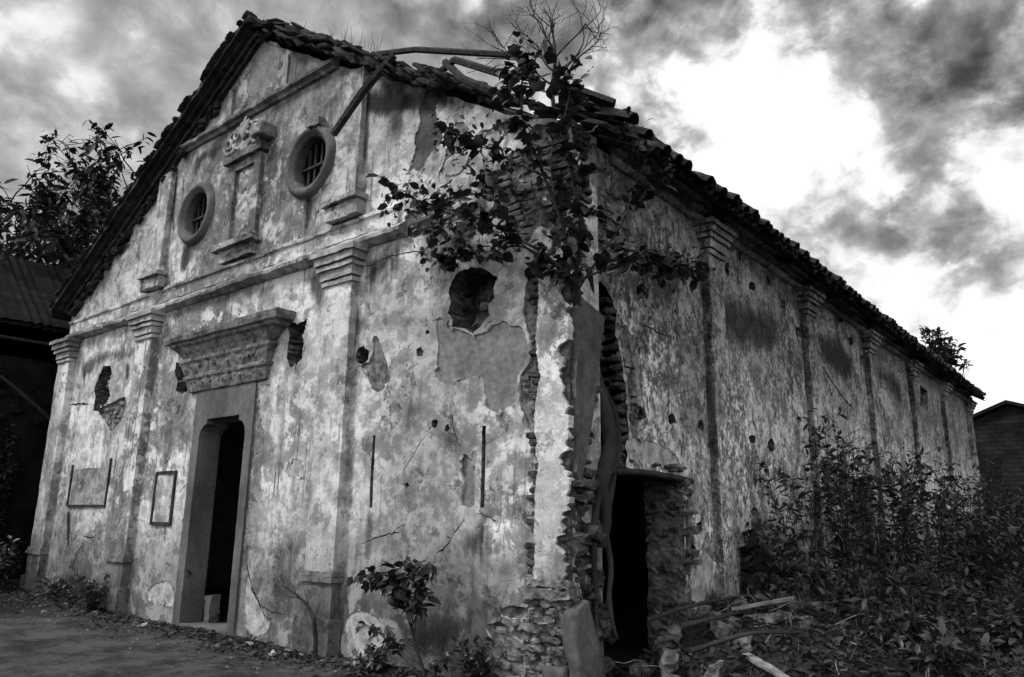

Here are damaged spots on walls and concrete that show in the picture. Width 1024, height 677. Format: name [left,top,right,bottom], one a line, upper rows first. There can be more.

flaking render [405,87,572,253]
flaking render [582,167,635,278]
spalling [93,365,126,432]
spalling [175,362,188,394]
spalling [287,319,307,370]
flaking render [356,336,389,393]
spalling [426,267,539,432]
damp [724,299,778,349]
damp [790,322,851,456]
crack [361,525,404,544]
crack [437,513,497,553]
crack [246,554,283,621]